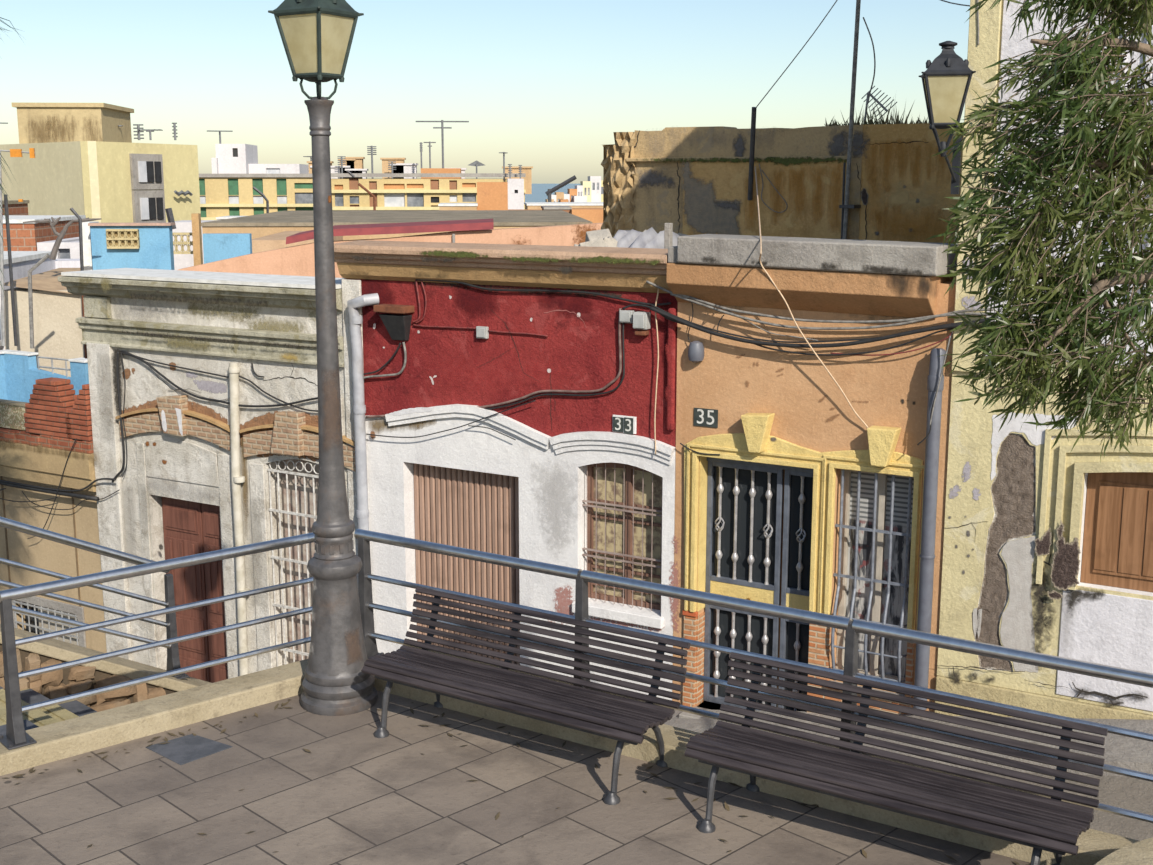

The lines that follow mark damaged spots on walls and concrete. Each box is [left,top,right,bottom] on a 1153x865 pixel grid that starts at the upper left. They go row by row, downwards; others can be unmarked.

water stain [828,131,870,157]
spalling [121,362,278,447]
spalling [257,453,319,461]
spalling [949,412,1081,673]
crack [936,665,1148,706]